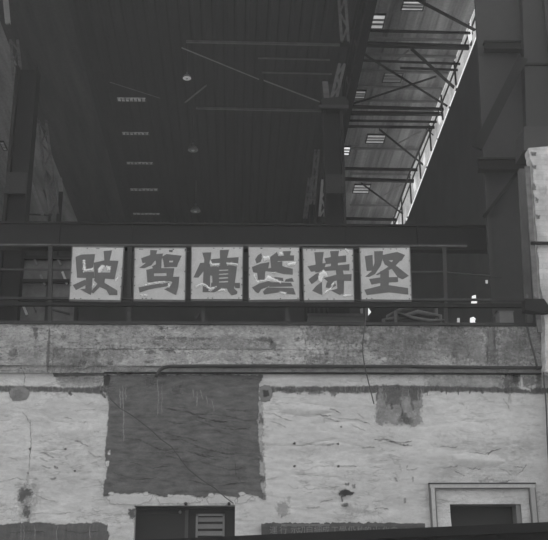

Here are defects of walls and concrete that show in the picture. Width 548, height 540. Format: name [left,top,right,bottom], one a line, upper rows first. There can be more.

peeling [107,397,266,505]